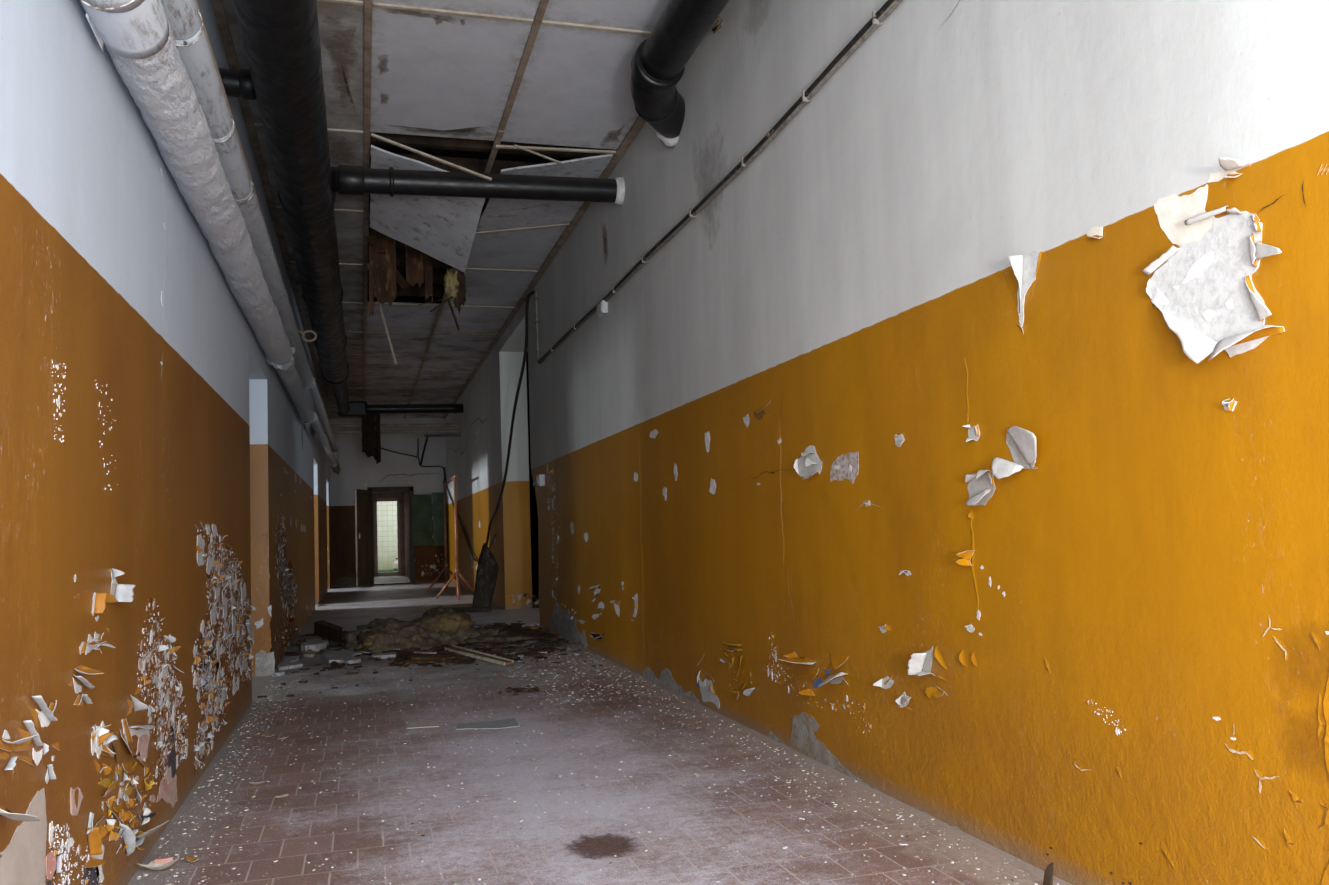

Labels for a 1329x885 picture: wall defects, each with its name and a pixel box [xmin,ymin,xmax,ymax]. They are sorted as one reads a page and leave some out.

peeling [1008,251,1043,335]
peeling [1142,157,1285,364]
peeling [794,445,859,483]
peeling [962,424,980,442]
peeling [965,426,1037,506]
peeling [0,516,322,885]
spalling [643,638,755,708]
spalling [767,635,877,790]
peeling [873,646,978,711]
water stain [567,834,635,859]